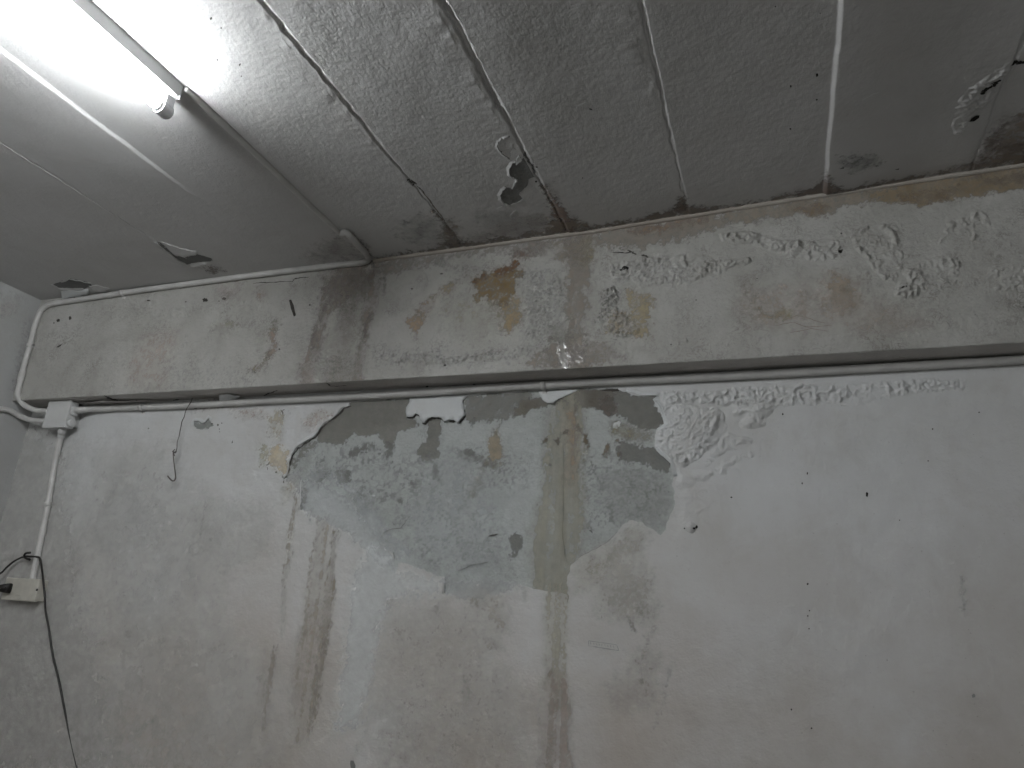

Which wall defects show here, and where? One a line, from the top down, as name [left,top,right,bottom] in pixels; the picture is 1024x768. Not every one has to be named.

peeling [154,241,212,267]
peeling [495,136,538,217]
leakage [300,113,1024,384]
peeling [282,384,677,600]
leakage [533,388,584,768]